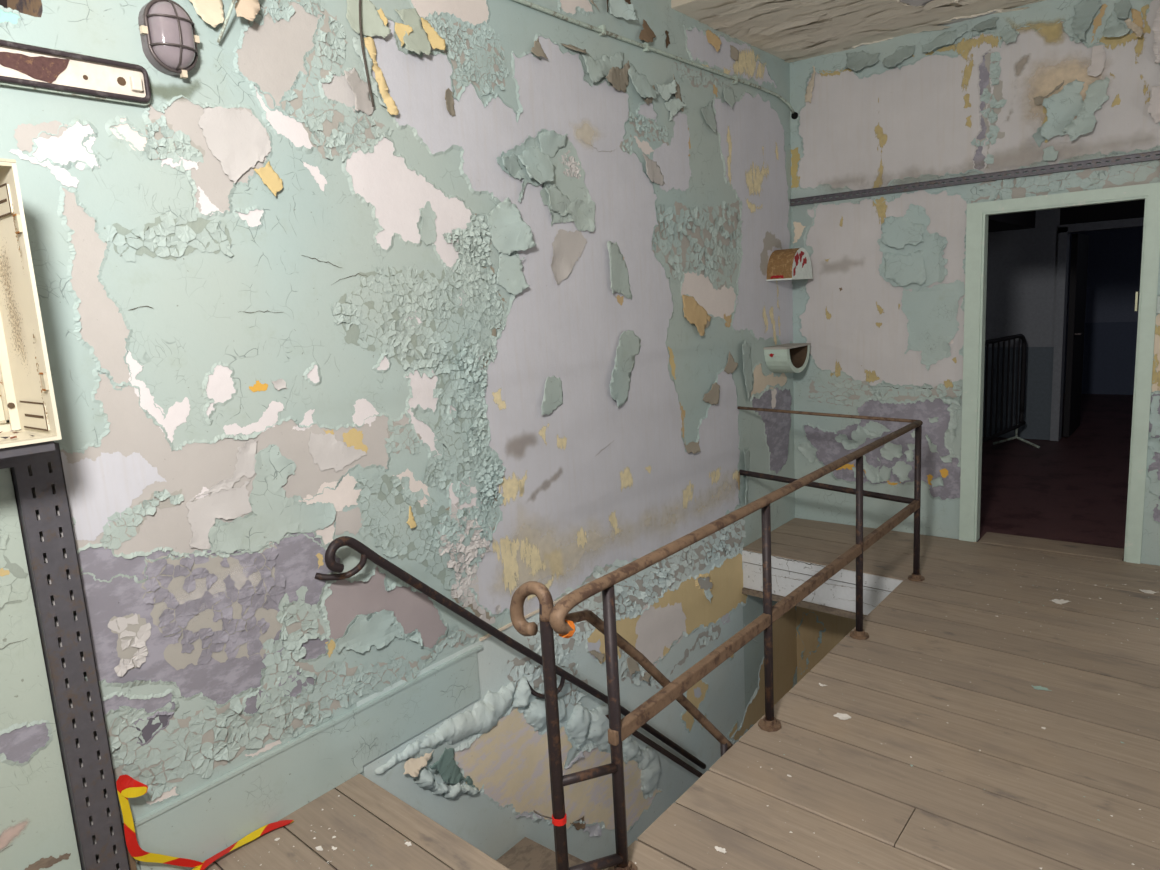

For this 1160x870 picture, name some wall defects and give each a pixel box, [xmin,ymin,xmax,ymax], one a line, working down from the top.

peeling [0,5,23,29]
peeling [9,0,458,746]
peeling [317,0,1160,682]
crack [0,529,30,611]
spalling [454,706,662,837]
peeling [680,679,709,733]
peeling [727,606,826,743]